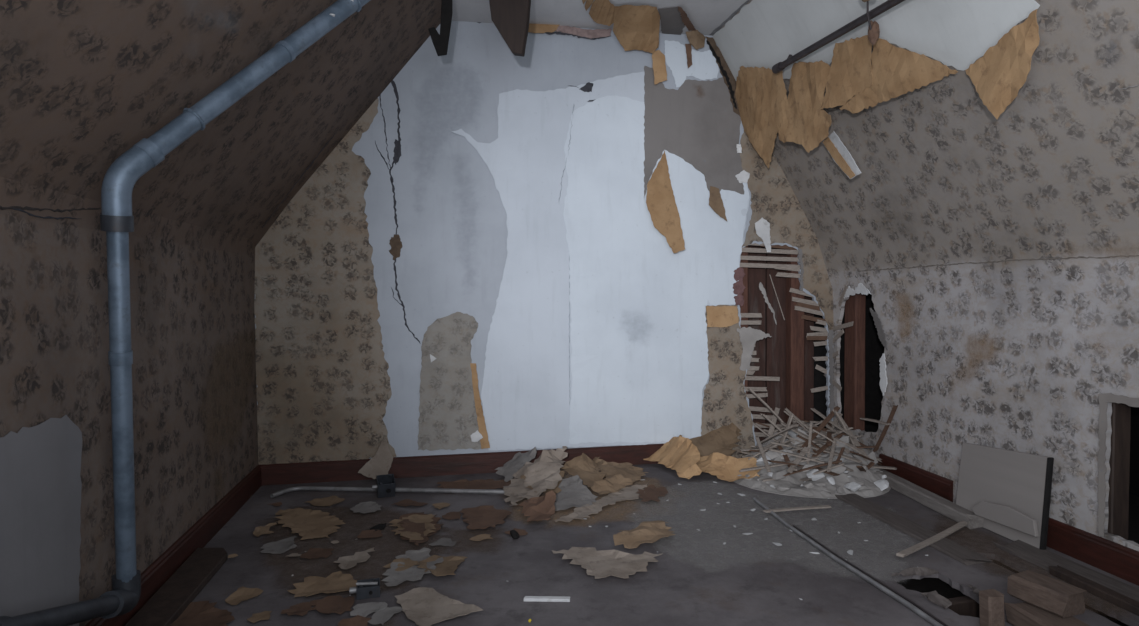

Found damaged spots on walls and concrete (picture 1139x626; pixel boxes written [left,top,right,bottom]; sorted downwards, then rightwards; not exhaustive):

peeling [470,363,490,449]